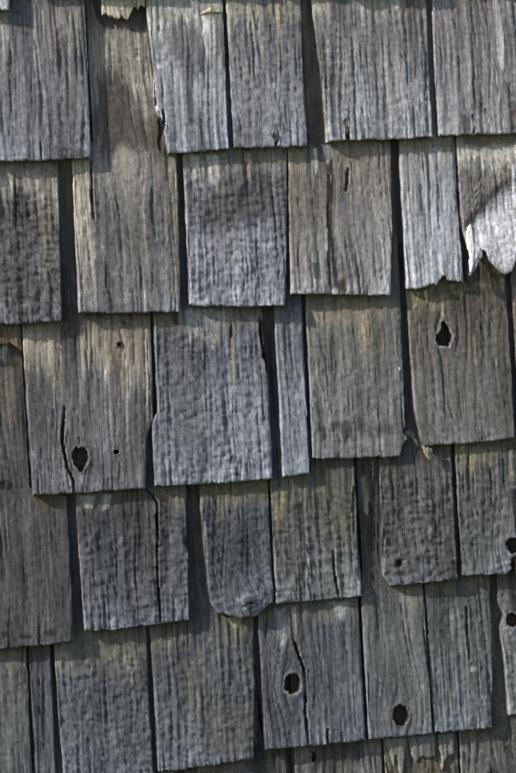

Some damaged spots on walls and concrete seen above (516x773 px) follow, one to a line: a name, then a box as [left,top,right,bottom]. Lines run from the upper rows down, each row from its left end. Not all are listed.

leakage [95,70,169,157]
crack [61,413,80,489]
crack [292,625,339,744]